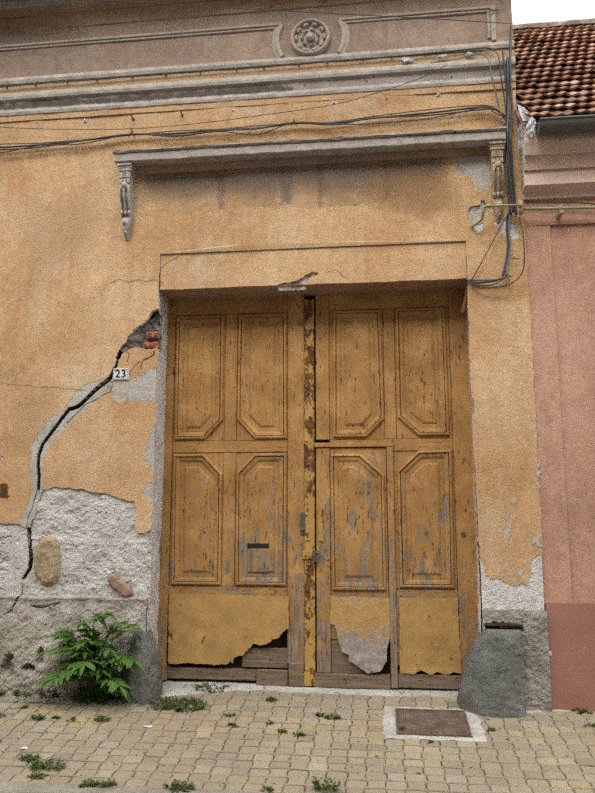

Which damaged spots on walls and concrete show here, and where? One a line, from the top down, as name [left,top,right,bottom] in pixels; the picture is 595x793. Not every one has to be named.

flaking render [0,368,156,609]
crack [4,345,155,497]
crack [5,516,59,615]
flaking render [477,522,544,632]